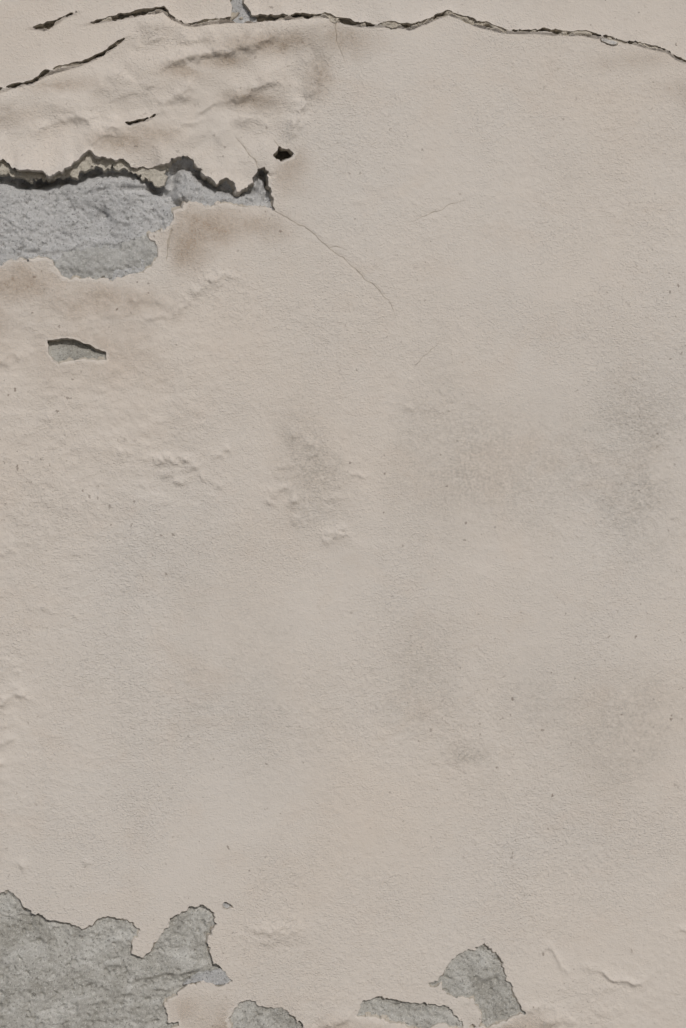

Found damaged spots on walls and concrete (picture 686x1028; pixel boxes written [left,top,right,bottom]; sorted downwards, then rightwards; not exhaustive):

crack [0,6,686,90]
spalling [0,0,334,282]
spalling [47,338,107,365]
spalling [0,890,234,1028]
spalling [228,1000,303,1028]
spalling [356,943,526,1028]